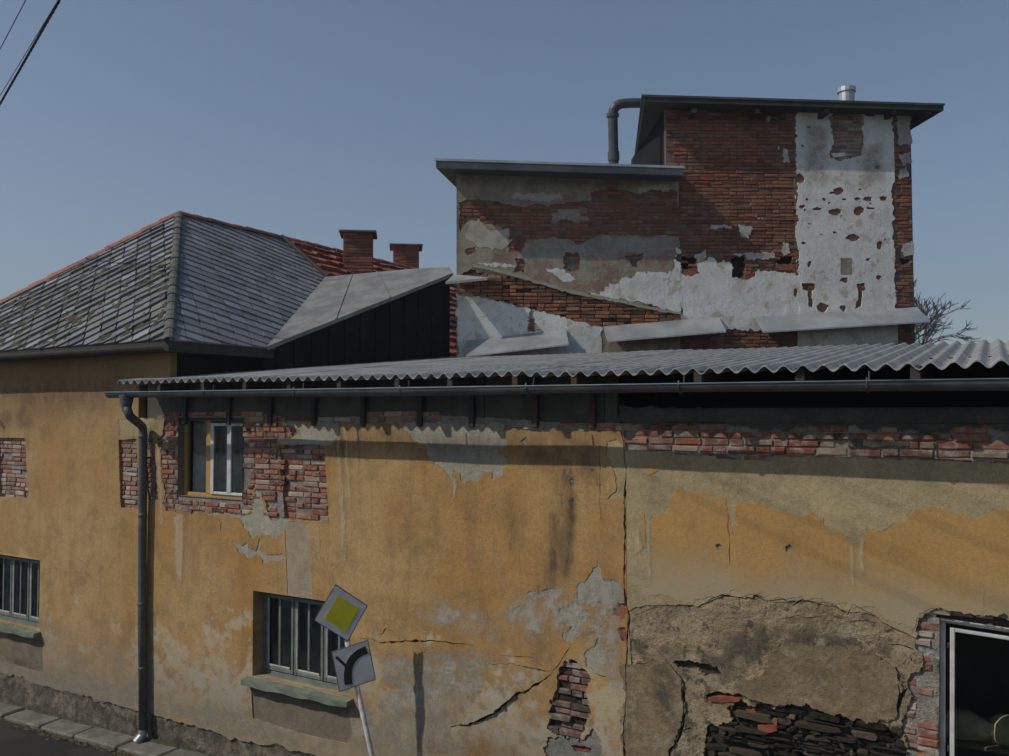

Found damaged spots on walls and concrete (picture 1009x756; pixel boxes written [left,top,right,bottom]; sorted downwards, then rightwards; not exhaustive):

flaking render [457,109,915,350]
crack [454,652,567,726]
flaking render [119,411,1009,599]
peeling [527,487,1009,756]